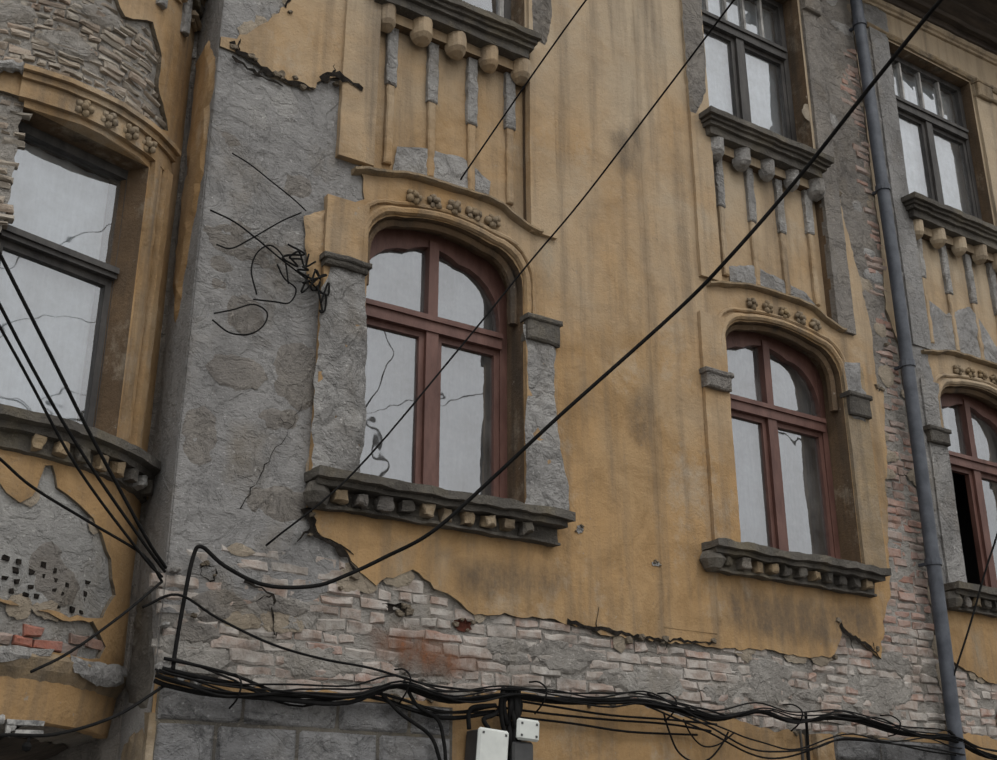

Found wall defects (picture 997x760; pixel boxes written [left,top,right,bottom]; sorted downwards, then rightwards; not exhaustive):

flaking render [149,313,946,740]
flaking render [0,554,104,659]
flaking render [954,665,997,740]